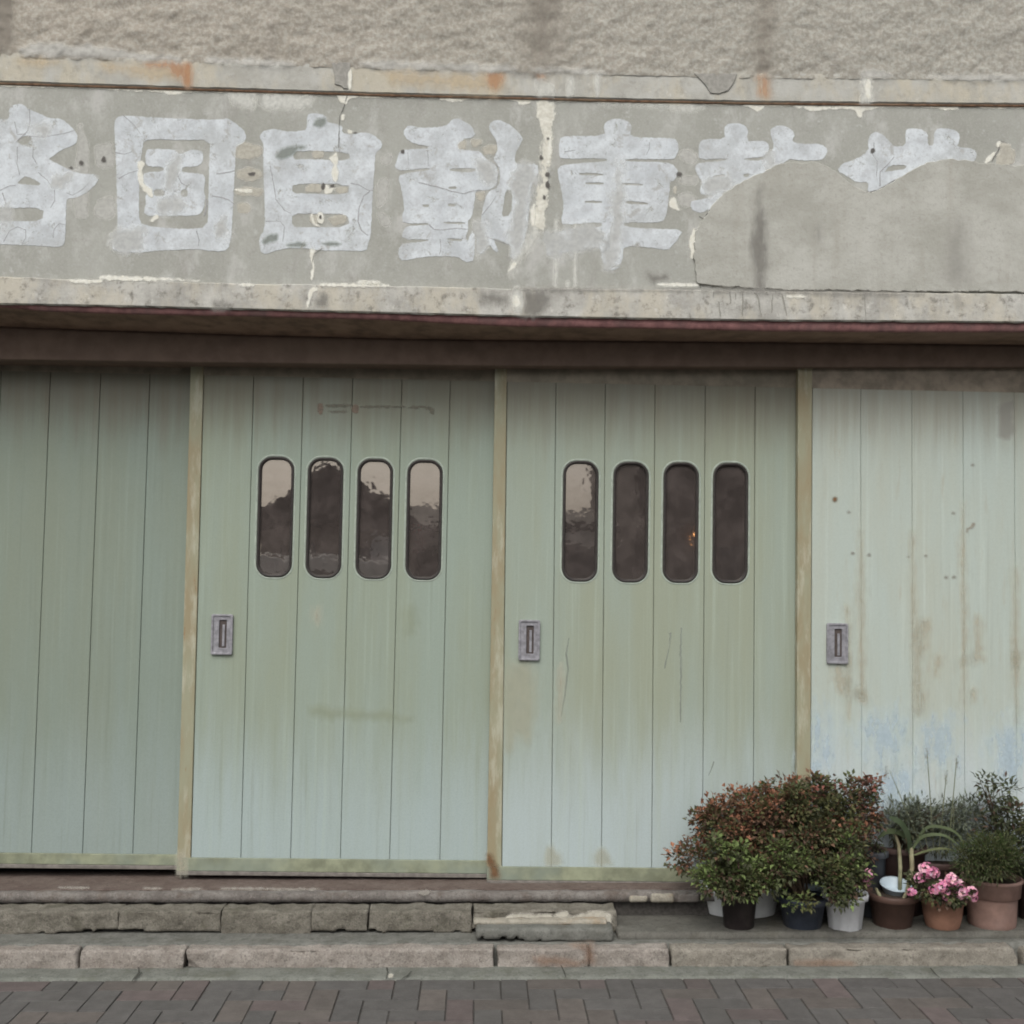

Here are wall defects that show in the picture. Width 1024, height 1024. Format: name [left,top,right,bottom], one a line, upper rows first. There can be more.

leakage [21,44,177,60]
corrosion [146,62,190,86]
spalling [694,73,737,94]
leakage [97,88,315,109]
leakage [489,0,958,273]
spalling [985,141,1015,165]
crack [307,95,373,308]
leakage [631,210,818,317]
leakage [69,275,182,284]
leakage [317,280,389,306]
corrosion [487,854,499,878]